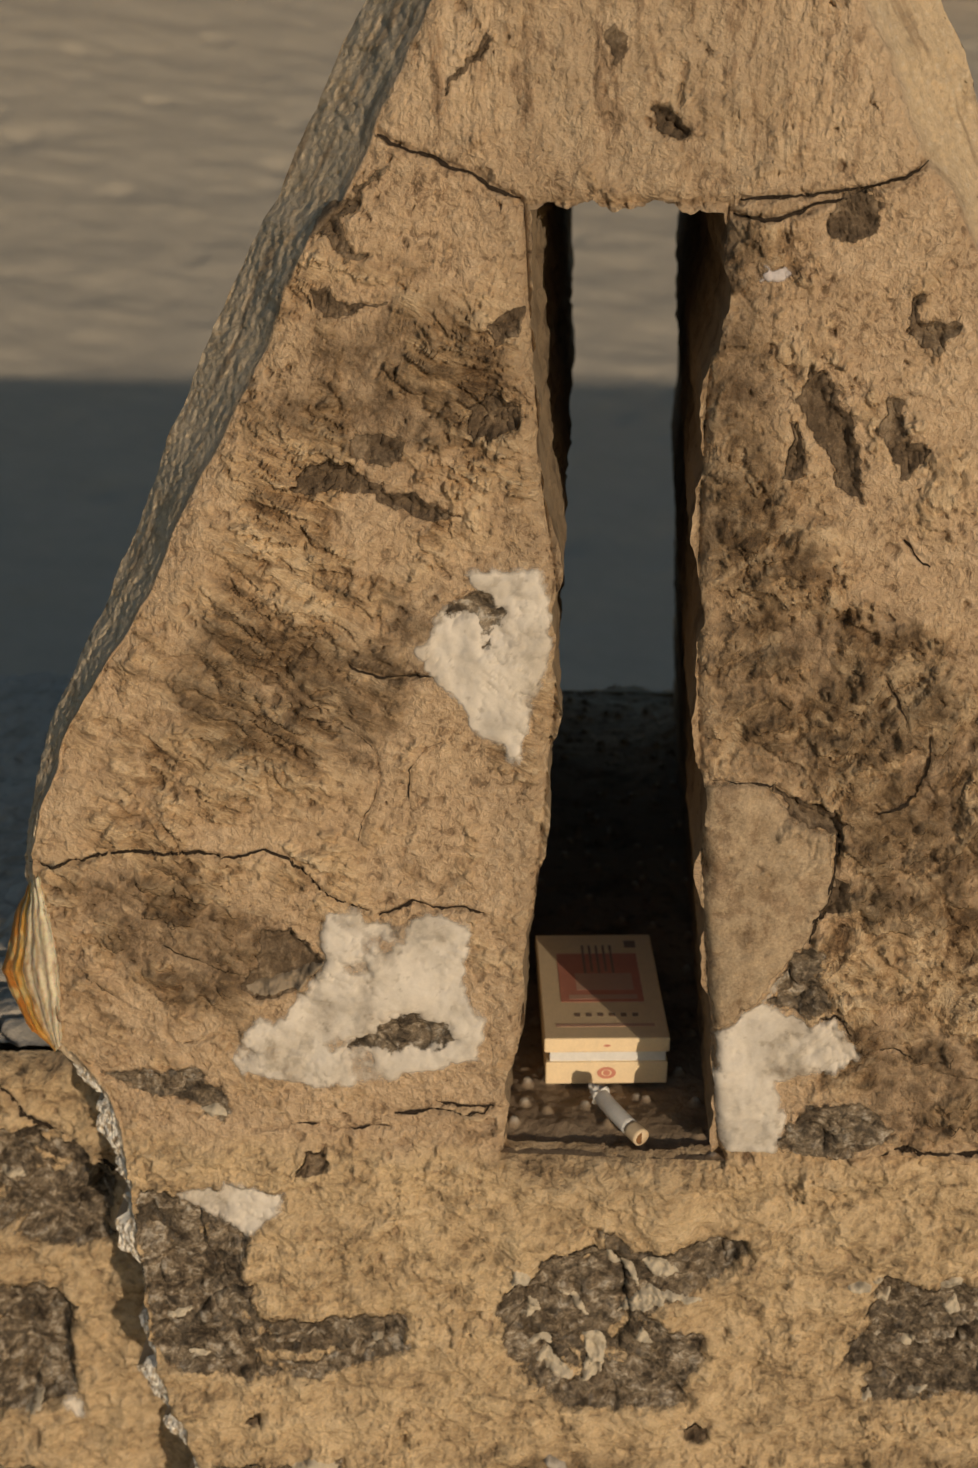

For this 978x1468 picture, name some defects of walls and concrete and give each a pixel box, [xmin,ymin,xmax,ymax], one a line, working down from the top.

crack [377,134,521,199]
crack [733,160,929,223]
spalling [782,366,865,505]
water stain [748,613,804,752]
water stain [810,655,960,779]
water stain [96,878,261,999]
crack [31,849,484,916]
water stain [858,798,975,924]
spalling [0,1126,117,1248]
crack [881,1145,978,1158]
spalling [133,1183,412,1383]
spalling [495,1230,749,1412]